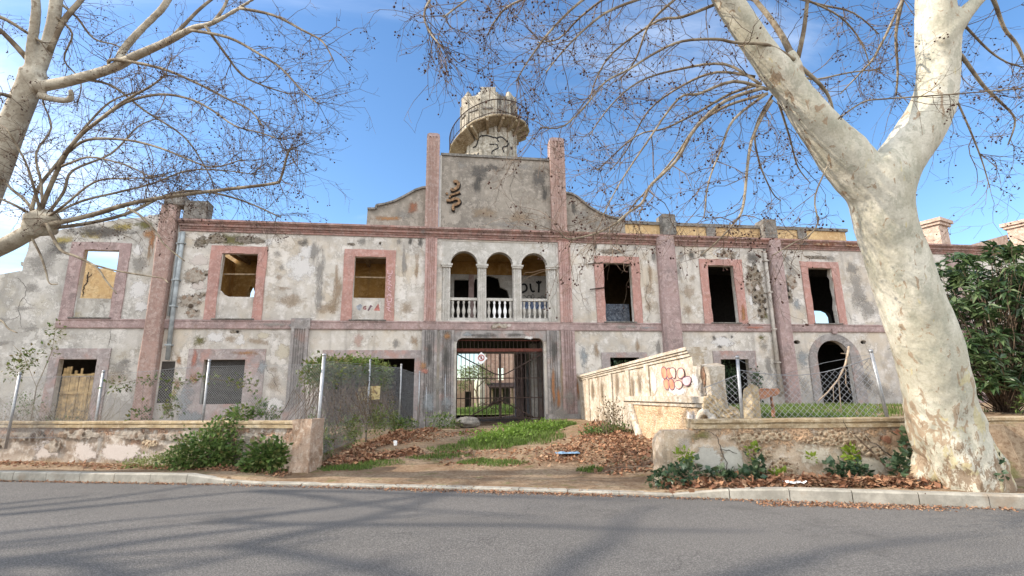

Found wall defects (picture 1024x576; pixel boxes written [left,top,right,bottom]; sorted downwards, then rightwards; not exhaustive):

spalling [179,233,272,318]
water stain [300,240,341,306]
spalling [712,247,768,321]
water stain [848,263,874,314]
spalling [0,429,183,462]
spalling [237,432,271,444]
spalling [726,428,908,476]